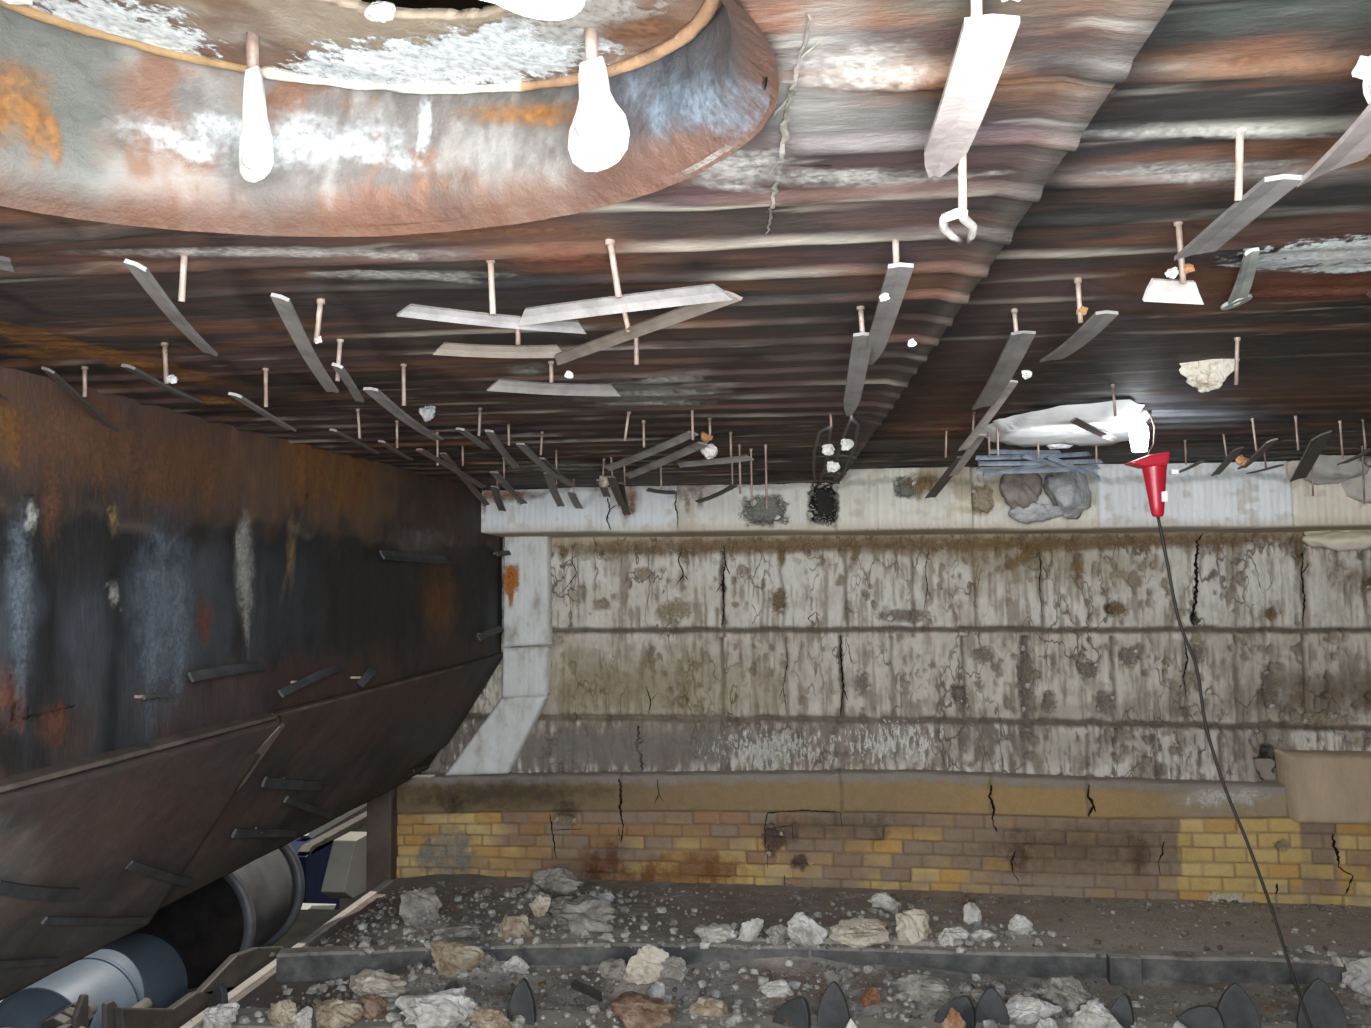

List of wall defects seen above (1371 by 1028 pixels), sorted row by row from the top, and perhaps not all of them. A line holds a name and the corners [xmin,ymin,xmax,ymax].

crack [765,13,820,236]
leakage [10,537,28,643]
rust [504,565,519,606]
crack [674,491,730,625]
spalling [741,495,789,527]
crack [779,612,848,716]
spalling [806,483,839,526]
leakage [1072,548,1083,579]
crack [1178,533,1204,697]
crack [618,686,663,841]
crack [988,785,1019,882]
crack [1331,834,1353,895]